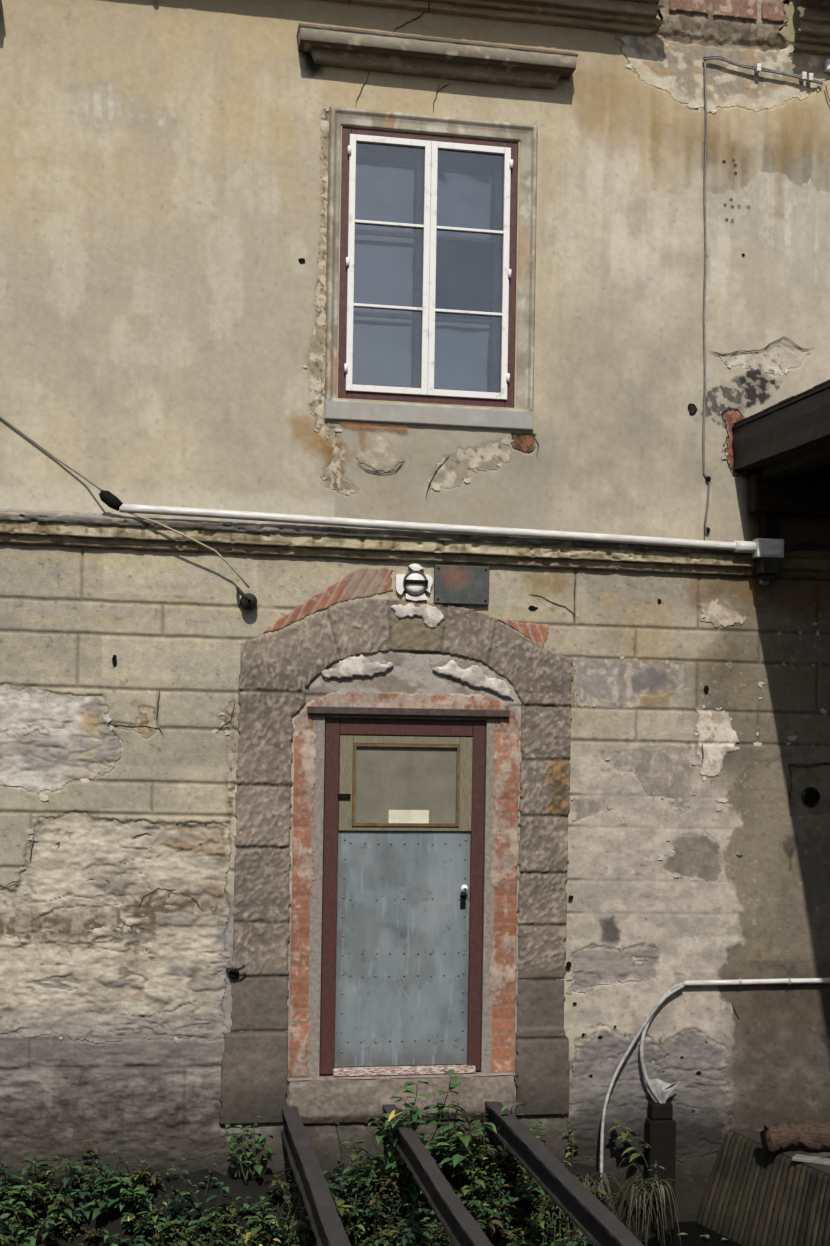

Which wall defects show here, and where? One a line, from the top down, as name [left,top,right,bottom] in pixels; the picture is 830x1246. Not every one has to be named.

crack [393,1,430,32]
flaking render [612,0,830,114]
water stain [734,172,827,283]
flaking render [303,108,361,496]
flaking render [710,336,813,375]
flaking render [426,434,539,497]
flaking render [698,598,746,627]
flaking render [604,705,762,814]
spalling [0,684,238,1044]
flaking render [658,832,722,881]
spalling [565,916,660,1005]
spalling [566,1025,733,1162]